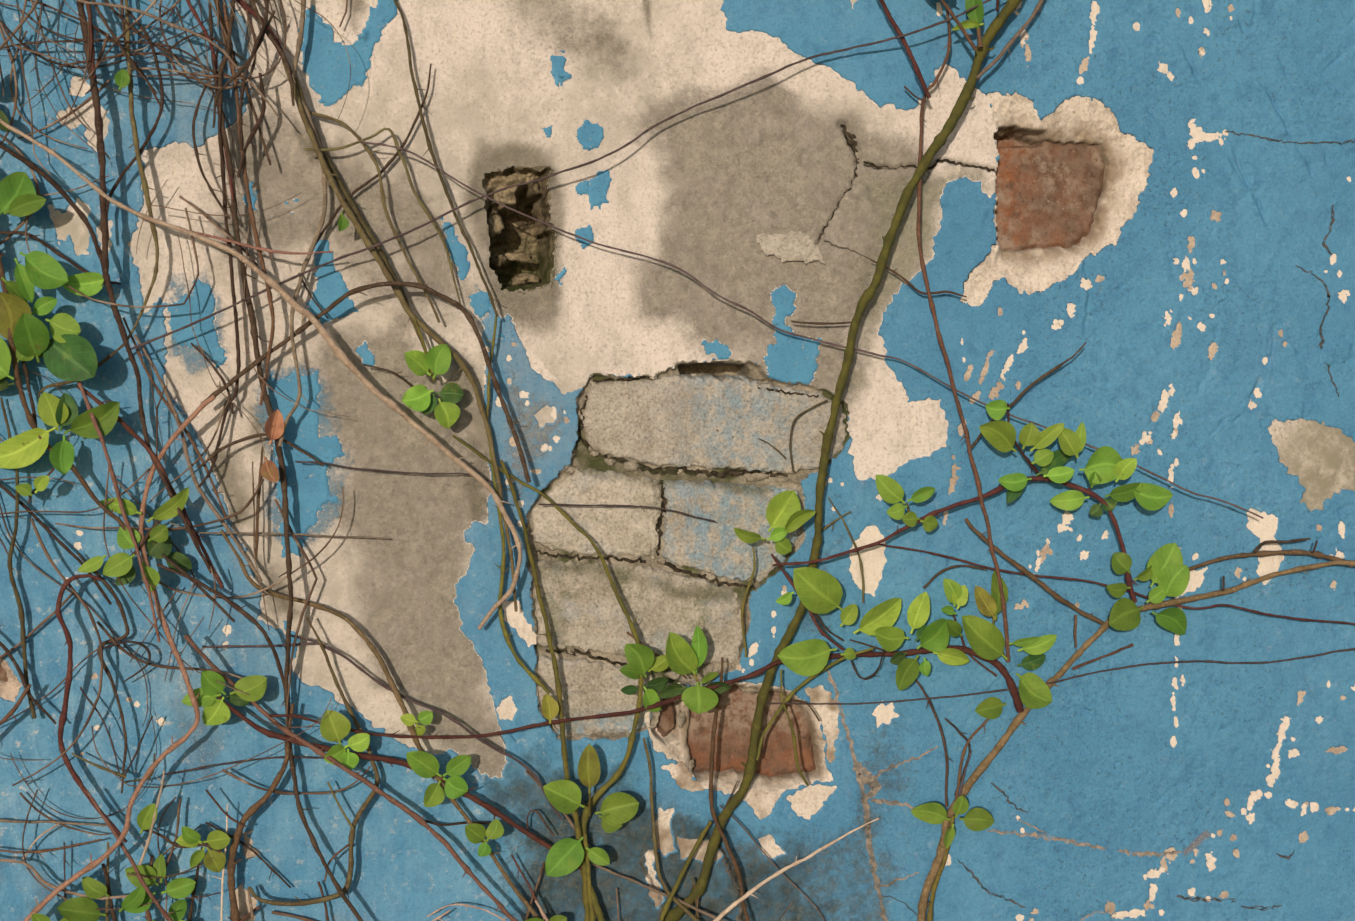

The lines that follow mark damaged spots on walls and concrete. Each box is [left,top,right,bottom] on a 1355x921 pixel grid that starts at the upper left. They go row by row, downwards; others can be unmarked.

spalling [1176,0,1235,58]
spalling [1157,63,1174,81]
crack [1225,131,1355,145]
crack [815,124,995,259]
crack [1295,205,1345,397]
peeling [48,0,1154,820]
peeling [1268,418,1355,531]
spalling [1330,521,1352,568]
spalling [0,655,22,702]
peeling [645,807,723,907]
peeling [758,834,785,859]
peeling [230,884,257,921]